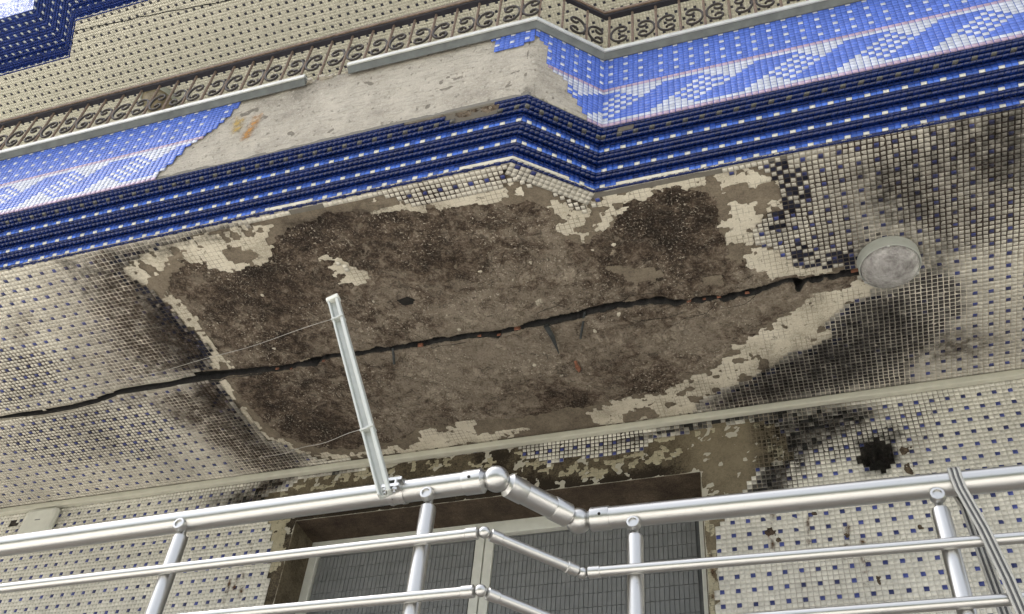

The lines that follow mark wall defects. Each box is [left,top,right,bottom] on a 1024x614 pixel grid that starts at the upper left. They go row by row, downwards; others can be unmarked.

spalling [157,34,587,177]
crack [0,268,859,421]
spalling [108,156,882,511]
leakage [717,302,973,485]
spalling [264,489,543,605]
spalling [703,519,725,614]